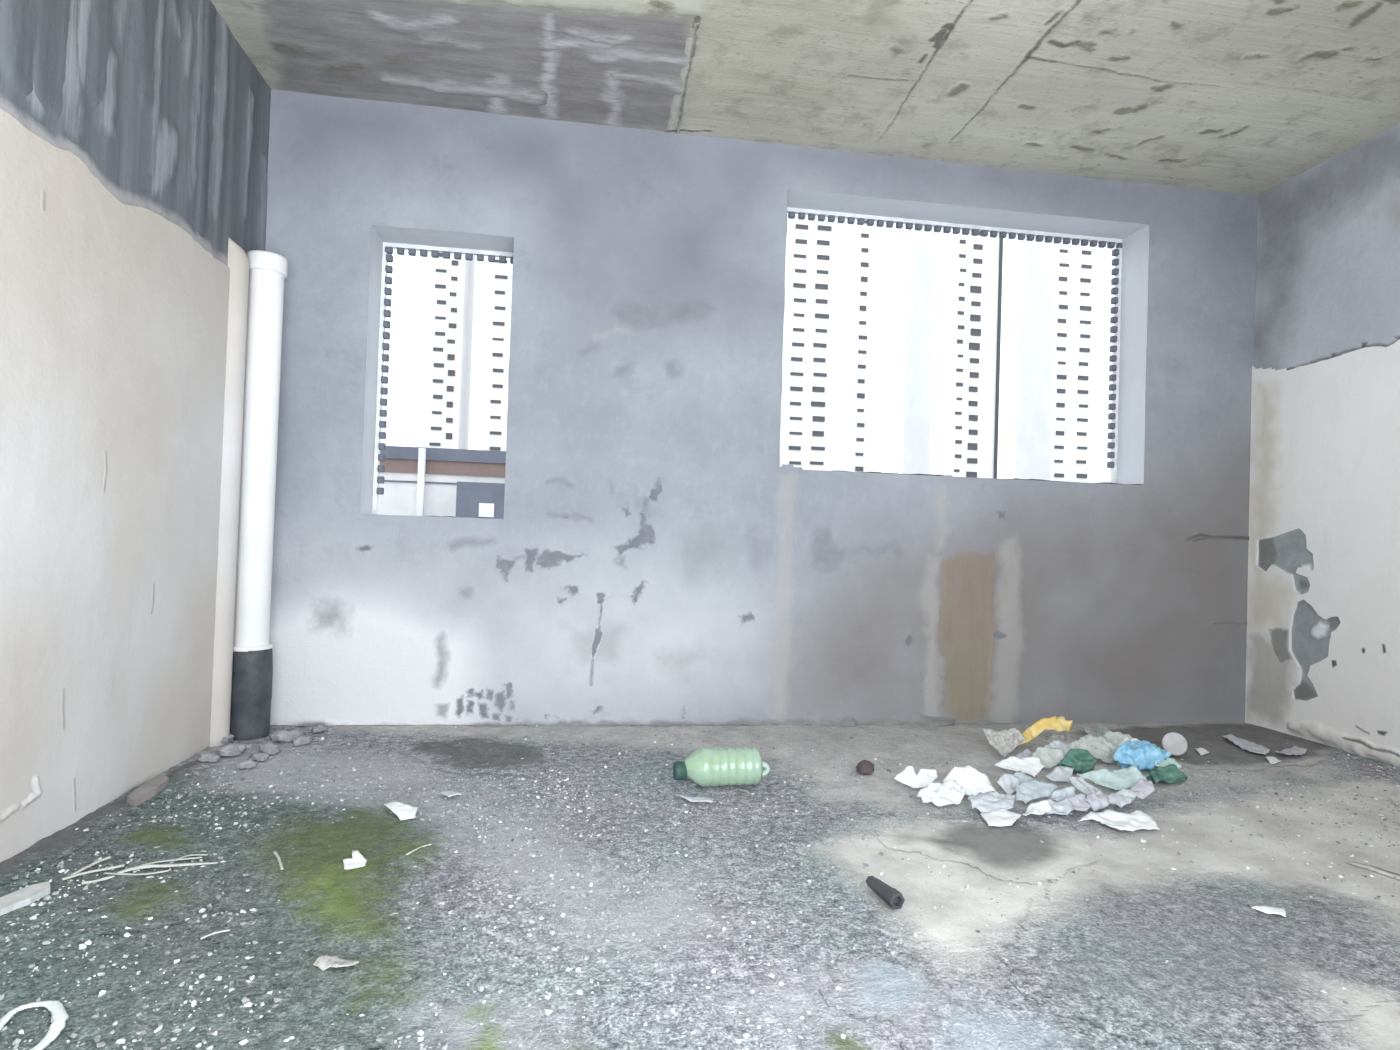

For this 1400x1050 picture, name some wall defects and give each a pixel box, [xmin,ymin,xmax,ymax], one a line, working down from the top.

peeling [0,0,271,266]
crack [843,0,977,143]
crack [945,0,1227,144]
spalling [493,542,593,609]
spalling [610,473,669,612]
spalling [735,607,760,630]
peeling [1258,529,1341,701]
peeling [431,678,521,722]